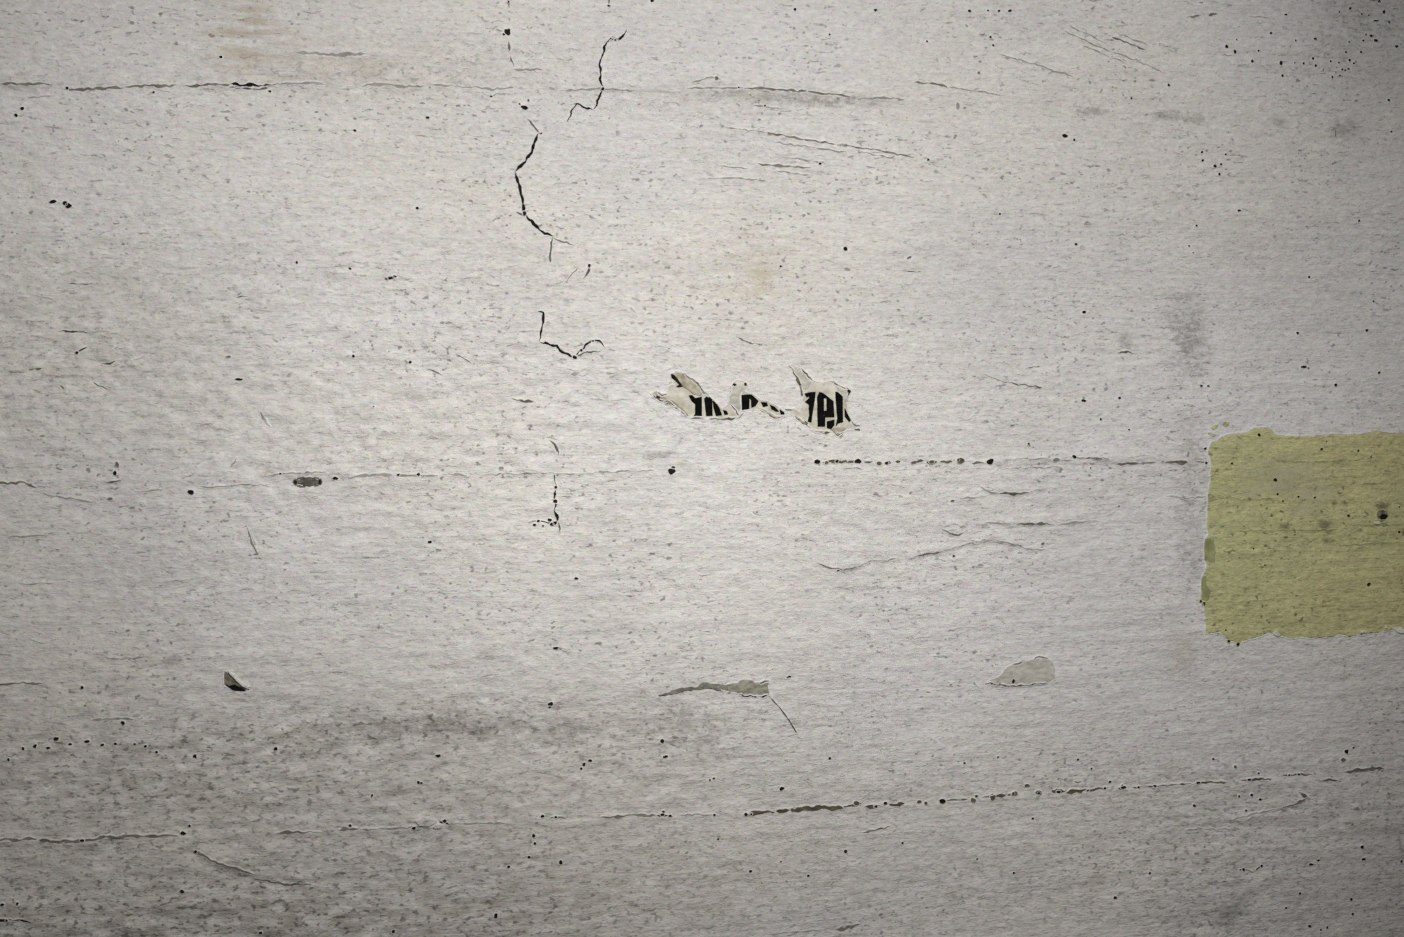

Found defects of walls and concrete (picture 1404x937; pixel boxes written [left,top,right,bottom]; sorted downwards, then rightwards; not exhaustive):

crack [1,0,635,279]
crack [538,309,606,360]
peeling [650,364,862,439]
peeling [222,670,251,694]
peeling [658,674,799,735]
peeling [984,654,1057,689]